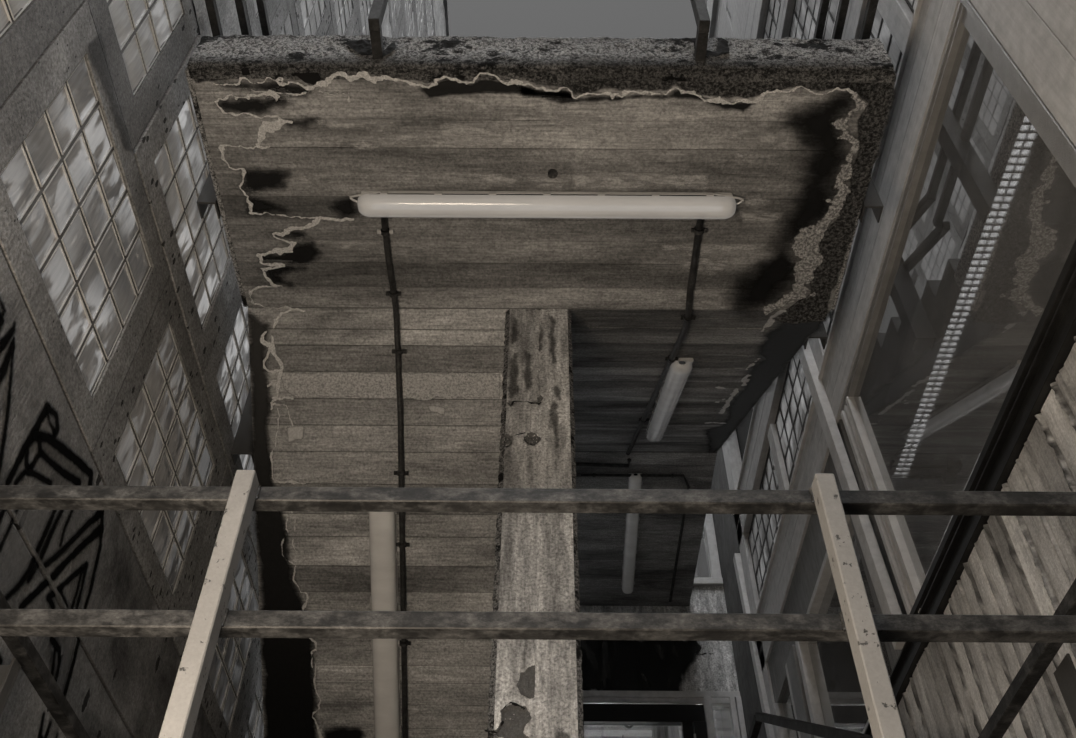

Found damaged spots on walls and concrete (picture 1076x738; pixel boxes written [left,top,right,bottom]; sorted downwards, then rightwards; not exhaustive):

damp [213,71,867,487]
damp [254,511,309,611]
damp [261,638,364,738]
spalling [489,665,535,738]